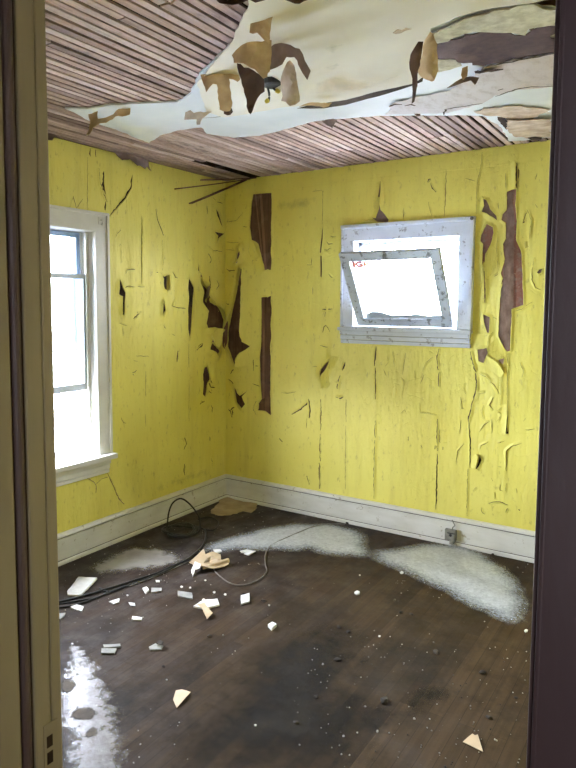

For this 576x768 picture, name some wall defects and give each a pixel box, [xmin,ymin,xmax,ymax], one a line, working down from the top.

spalling [297,78,423,109]
peeling [474,161,545,377]
peeling [115,274,128,319]
peeling [158,271,172,320]
peeling [185,190,275,417]
crack [83,473,125,504]